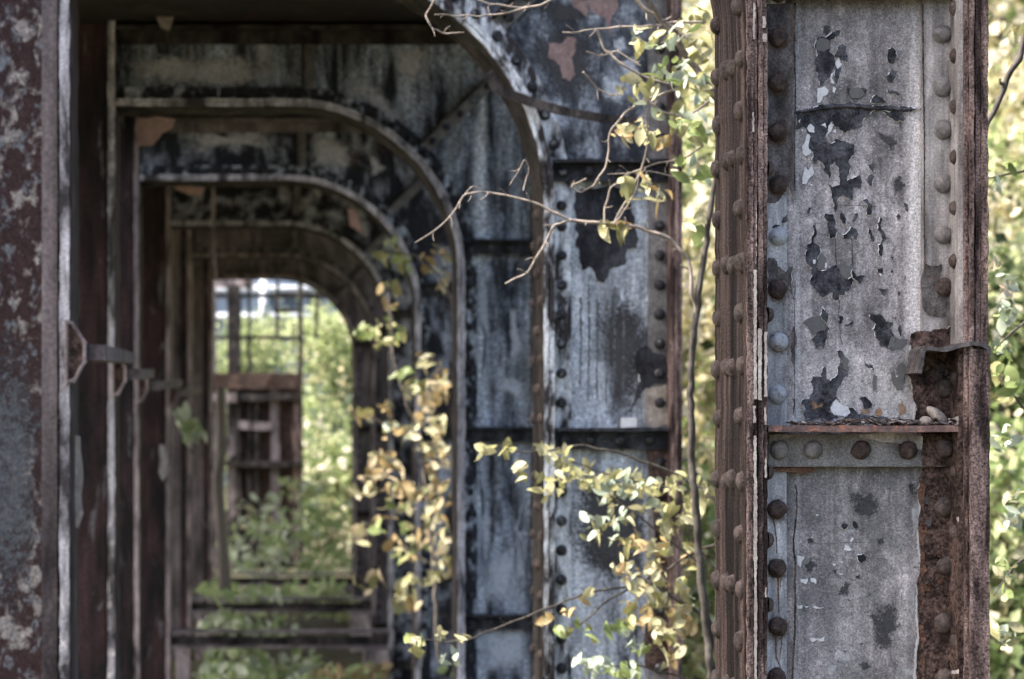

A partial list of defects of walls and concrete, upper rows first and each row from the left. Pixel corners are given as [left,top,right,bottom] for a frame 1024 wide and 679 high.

peeling [574,186,639,284]
peeling [766,3,920,351]
water stain [574,285,626,404]
peeling [793,350,923,450]
corrosion [899,263,964,679]